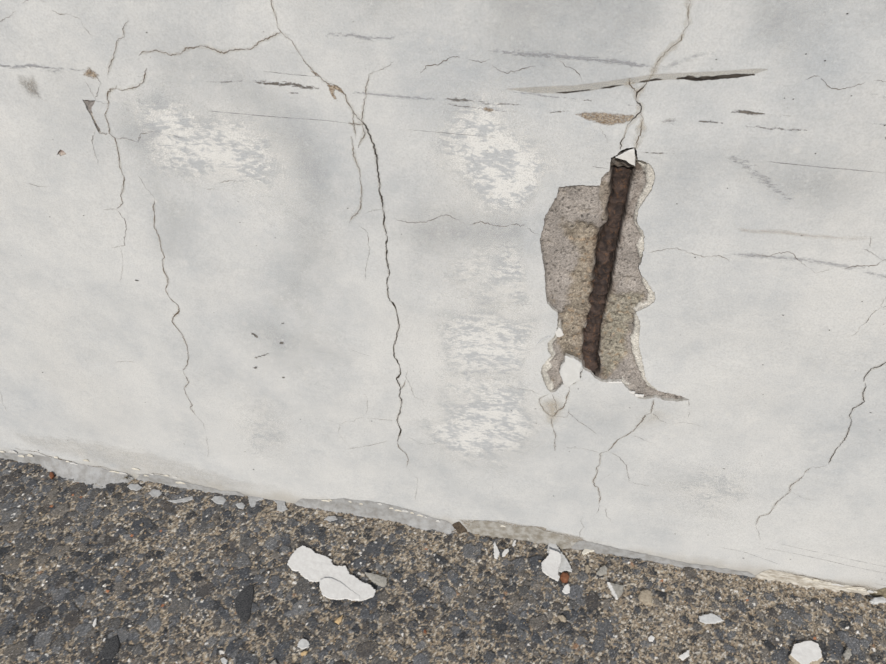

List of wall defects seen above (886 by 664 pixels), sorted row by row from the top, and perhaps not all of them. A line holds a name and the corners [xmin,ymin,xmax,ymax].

crack [620,4,690,150]
crack [92,2,522,464]
spalling [537,147,689,402]
crack [539,370,586,448]
crack [593,401,654,511]
crack [757,362,886,521]